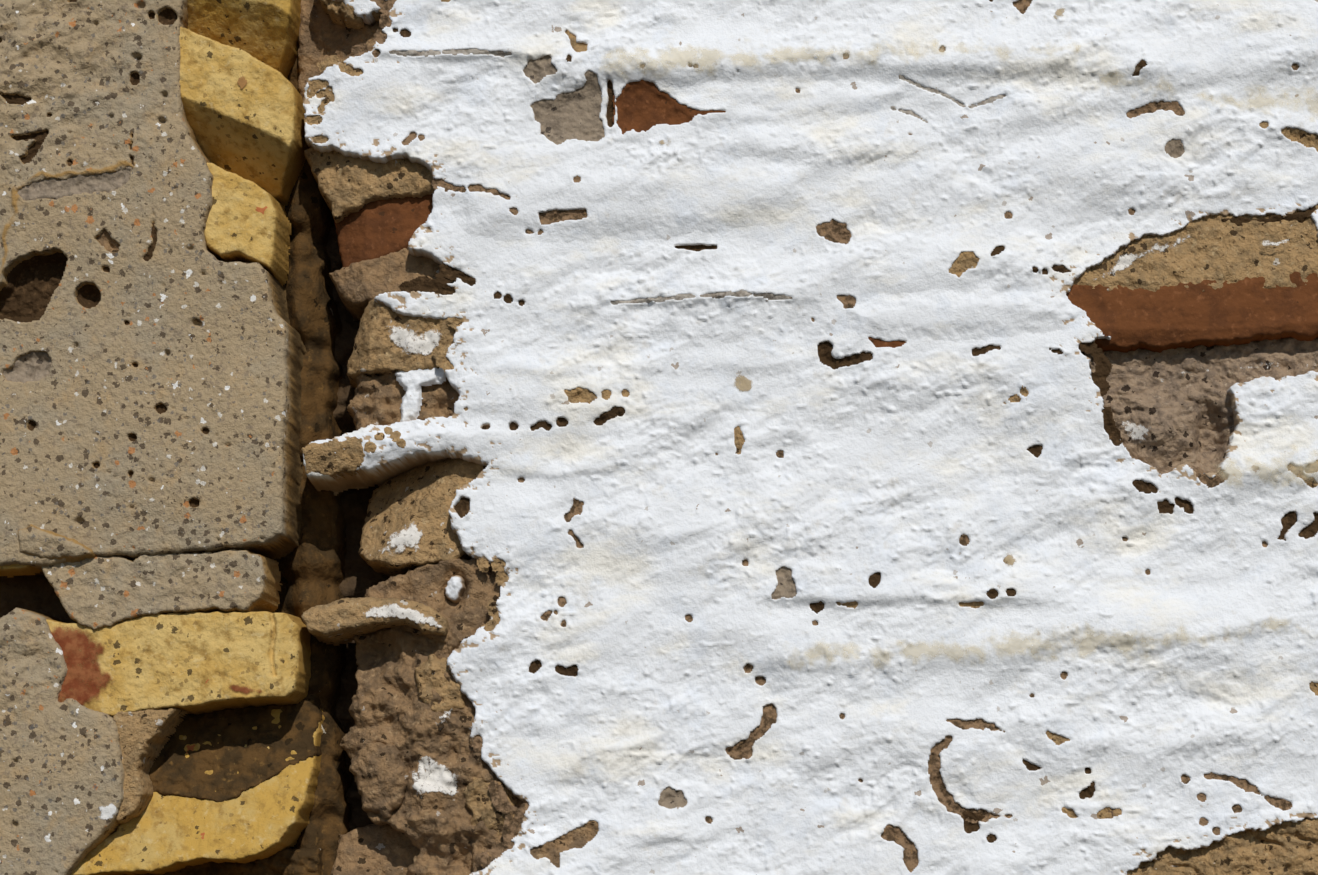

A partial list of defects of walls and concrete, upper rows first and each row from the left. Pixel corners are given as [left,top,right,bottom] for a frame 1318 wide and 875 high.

peeling [523,30,587,83]
peeling [531,64,726,145]
spalling [149,0,518,481]
peeling [494,291,525,306]
peeling [972,345,1001,356]
spalling [1032,205,1318,514]
peeling [564,498,584,548]
peeling [541,597,567,627]
spalling [0,458,529,875]
peeling [529,660,578,676]
crack [928,719,1013,833]
spalling [1127,772,1318,875]